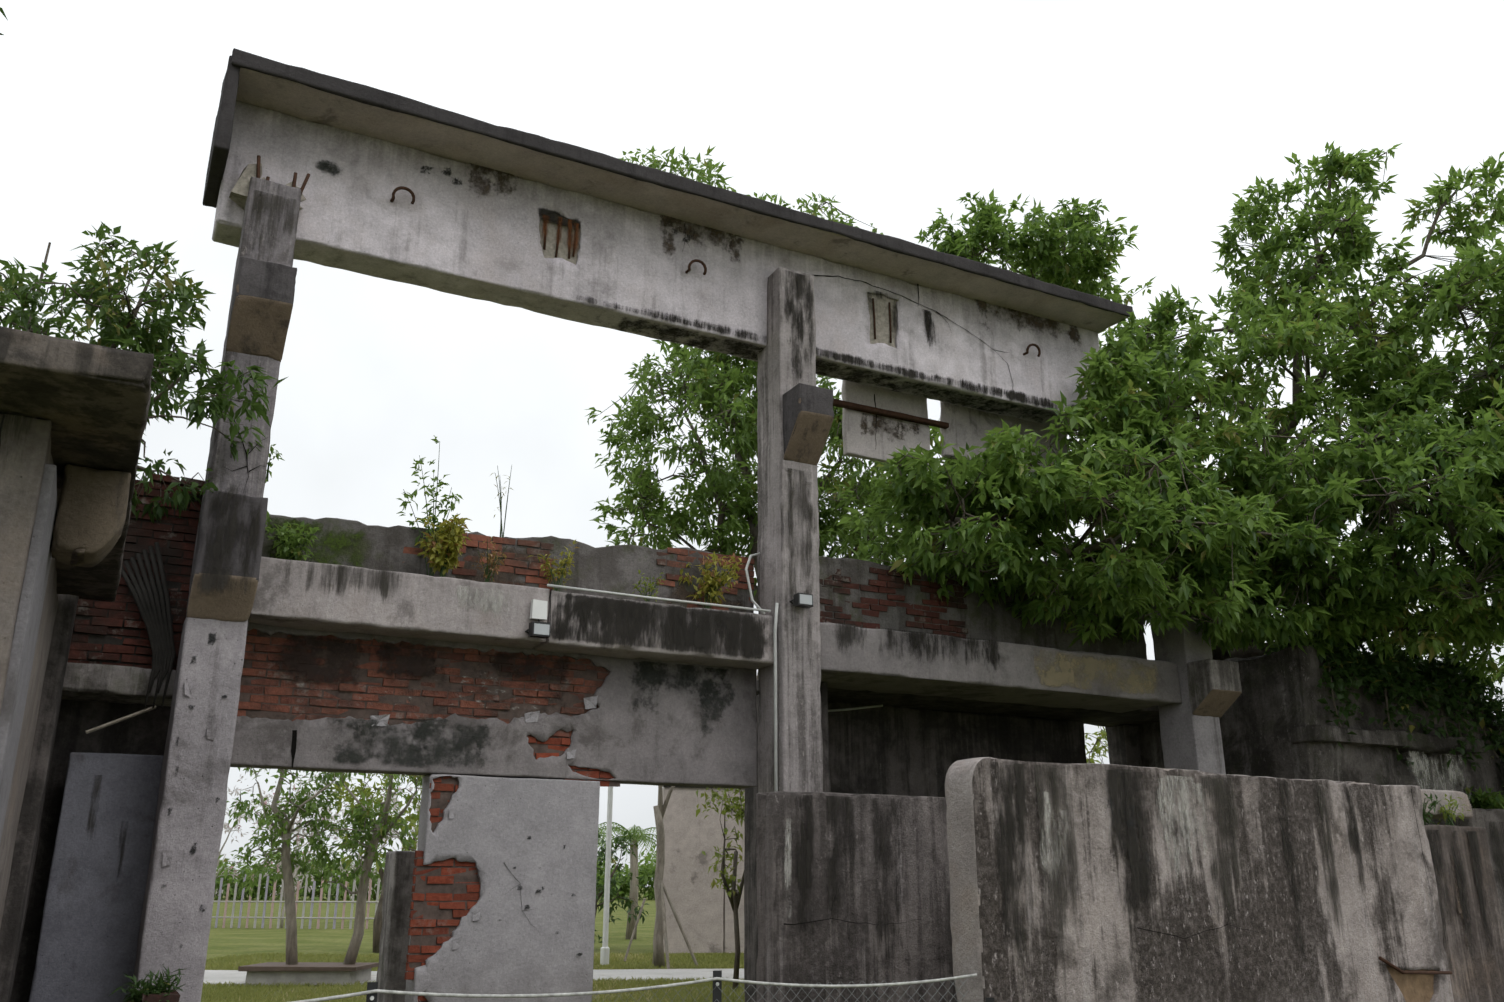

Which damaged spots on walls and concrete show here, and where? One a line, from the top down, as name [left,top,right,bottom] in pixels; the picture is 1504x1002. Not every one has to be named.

water stain [587,297,766,340]
crack [814,275,1013,383]
water stain [785,271,1080,408]
rust [861,413,919,441]
water stain [335,718,489,767]
spalling [222,629,620,787]
spalling [404,851,481,1002]
spalling [429,775,458,832]
water stain [551,593,766,732]
water stain [993,762,1078,958]
water stain [1108,769,1241,918]
water stain [1317,782,1365,926]